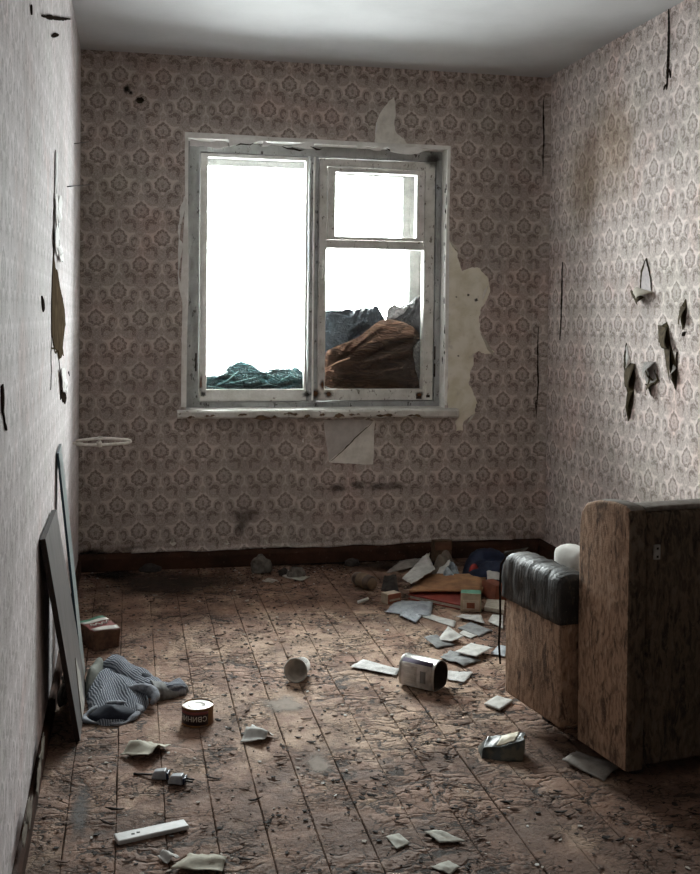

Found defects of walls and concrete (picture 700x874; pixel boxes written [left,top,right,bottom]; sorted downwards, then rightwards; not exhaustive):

crack [663,9,671,90]
peeling [190,139,321,151]
peeling [357,98,426,154]
crack [539,100,547,167]
peeling [442,240,494,431]
crack [535,262,563,418]
peeling [238,412,393,465]